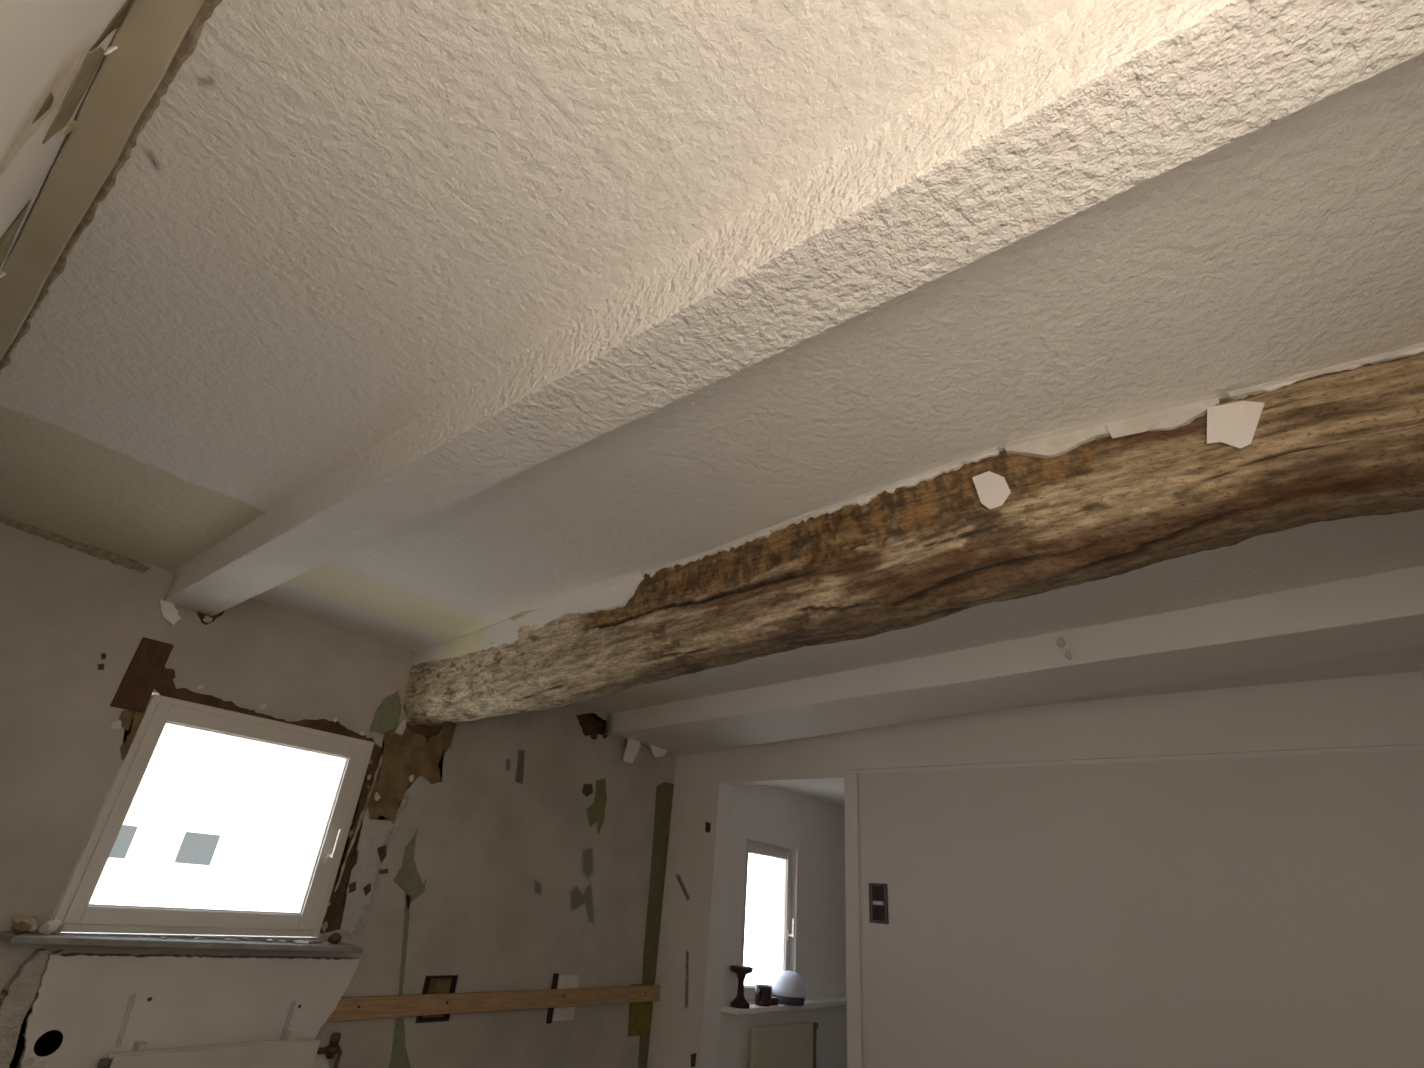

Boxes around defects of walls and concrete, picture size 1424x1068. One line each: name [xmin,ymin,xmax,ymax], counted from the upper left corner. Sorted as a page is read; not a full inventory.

flaking render [412,342,1424,665]
peeling [111,709,146,761]
spalling [577,714,607,740]
spalling [623,738,668,763]
peeling [154,679,456,933]